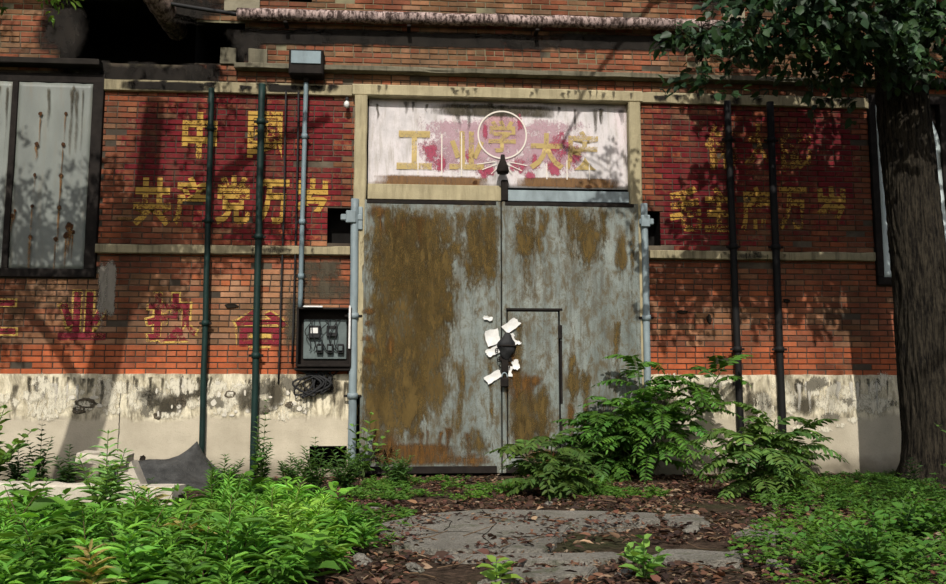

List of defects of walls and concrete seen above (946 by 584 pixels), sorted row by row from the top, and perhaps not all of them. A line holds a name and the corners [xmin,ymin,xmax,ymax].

corrosion [53,142,75,269]
corrosion [513,207,609,297]
corrosion [615,219,635,279]
corrosion [360,206,499,466]
water stain [11,377,104,401]
peeling [0,374,312,421]
water stain [127,376,212,414]
water stain [236,380,252,409]
water stain [268,379,290,407]
water stain [306,380,349,402]
corrosion [506,318,628,464]
water stain [794,379,888,414]